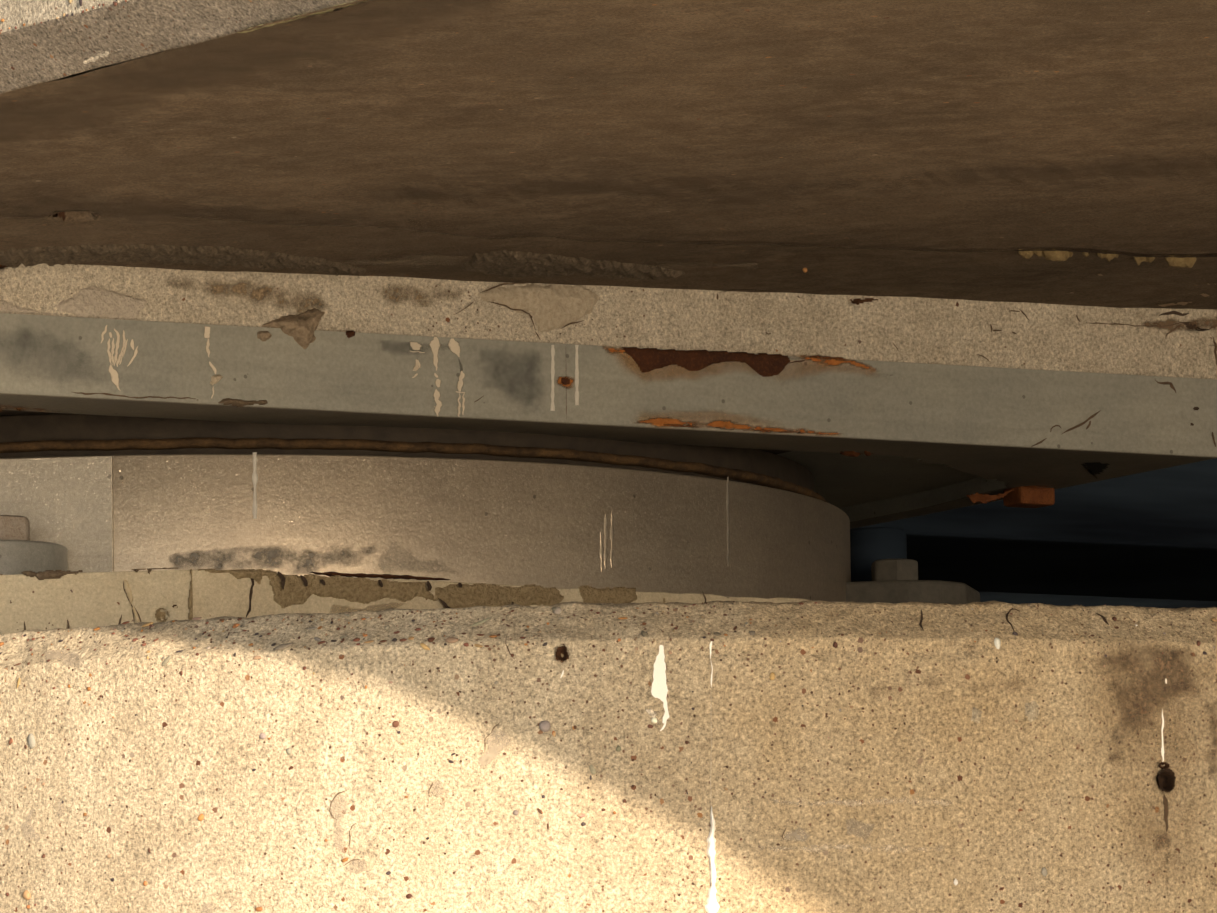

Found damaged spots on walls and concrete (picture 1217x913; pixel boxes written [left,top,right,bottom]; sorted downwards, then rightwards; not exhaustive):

water stain [101,325,138,367]
rust [606,347,875,377]
water stain [433,373,442,416]
water stain [456,371,465,417]
rust [637,417,841,435]
rust [967,486,1047,503]
spalling [0,567,774,670]
efflorescence [646,645,670,731]
water stain [1108,646,1194,762]
water stain [1157,795,1169,847]
efflorescence [705,806,720,913]